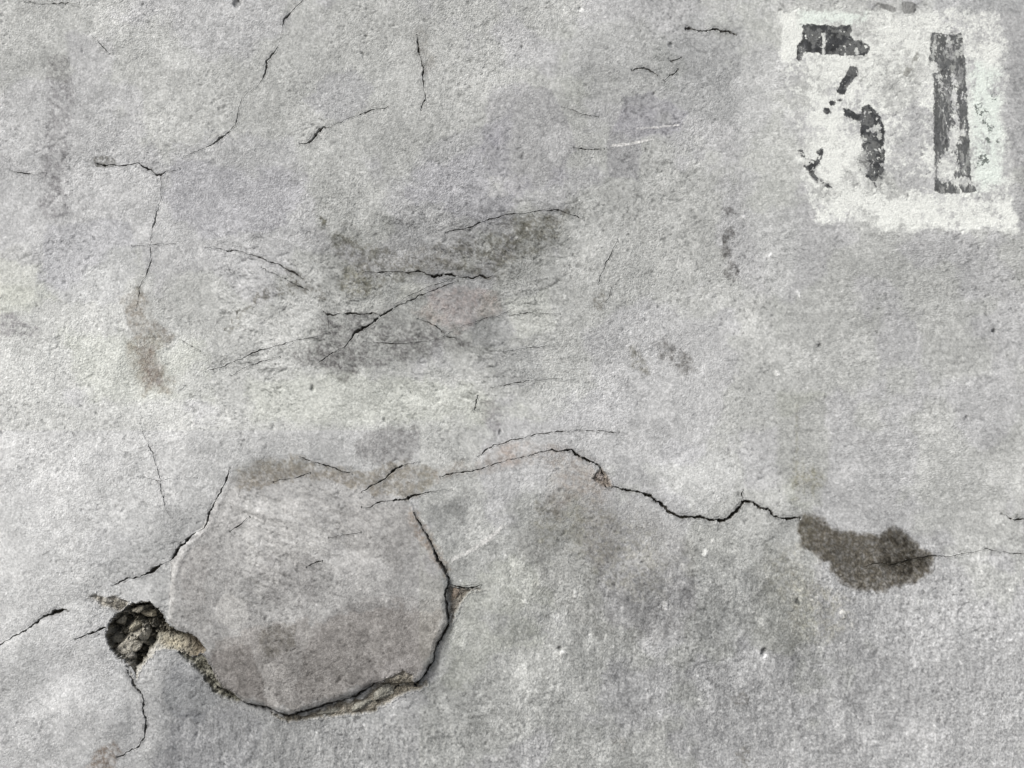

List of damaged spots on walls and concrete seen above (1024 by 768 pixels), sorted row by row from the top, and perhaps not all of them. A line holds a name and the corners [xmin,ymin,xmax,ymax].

crack [415,35,428,110]
crack [97,0,308,310]
crack [300,106,388,146]
crack [446,208,584,234]
crack [184,269,566,377]
crack [112,424,250,587]
crack [205,428,799,719]
leakage [756,403,935,650]
crack [862,547,1024,569]
crack [0,607,68,647]
crack [74,625,108,641]
crack [117,666,149,759]